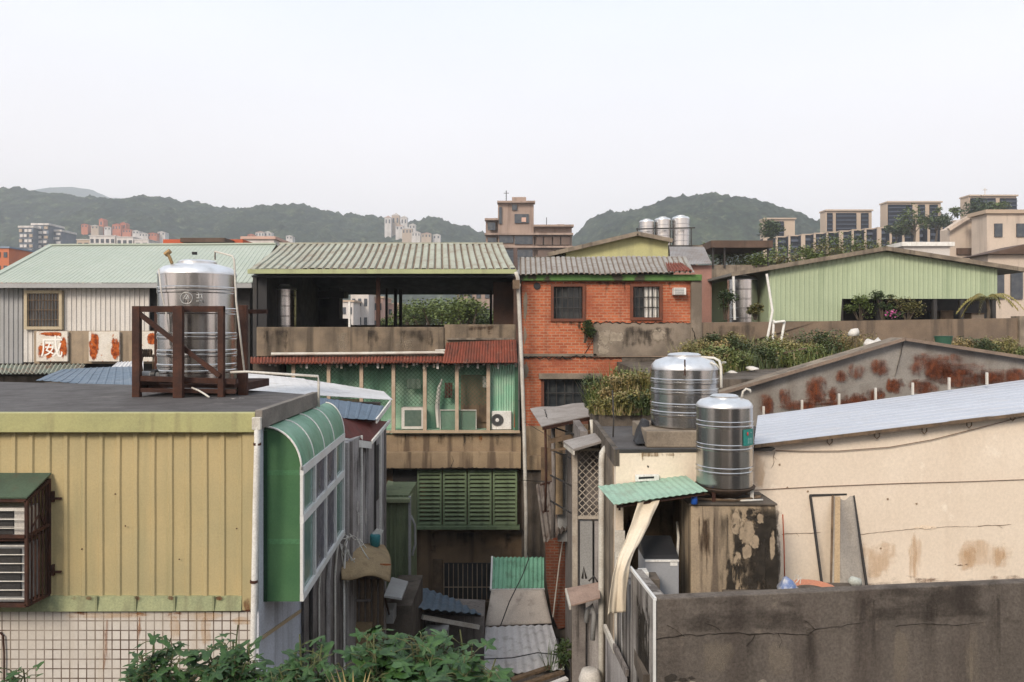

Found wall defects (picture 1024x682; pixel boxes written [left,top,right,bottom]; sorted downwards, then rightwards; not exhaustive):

corrosion [38,332,67,359]
corrosion [89,334,119,360]
corrosion [761,354,1024,413]
peeling [731,512,775,566]
crack [656,620,858,648]